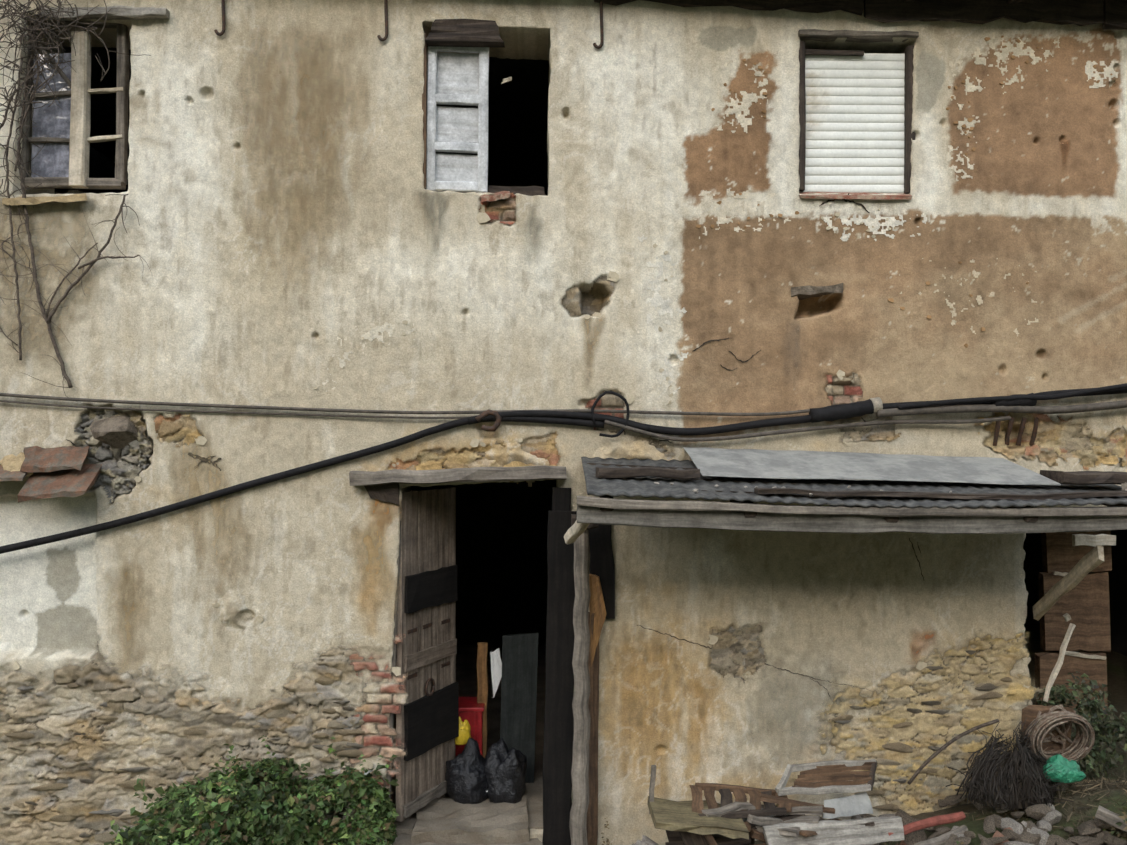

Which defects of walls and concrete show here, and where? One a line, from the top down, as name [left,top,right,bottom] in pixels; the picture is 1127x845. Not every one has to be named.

peeling [711,49,775,133]
peeling [943,31,1060,181]
flaking render [476,193,516,225]
peeling [821,201,928,241]
flaking render [562,271,619,319]
crack [693,338,761,371]
flaking render [0,404,207,504]
flaking render [975,412,1127,470]
crack [637,625,712,649]
crack [765,663,868,703]
flaking render [0,635,407,845]
flaking render [820,632,1043,816]